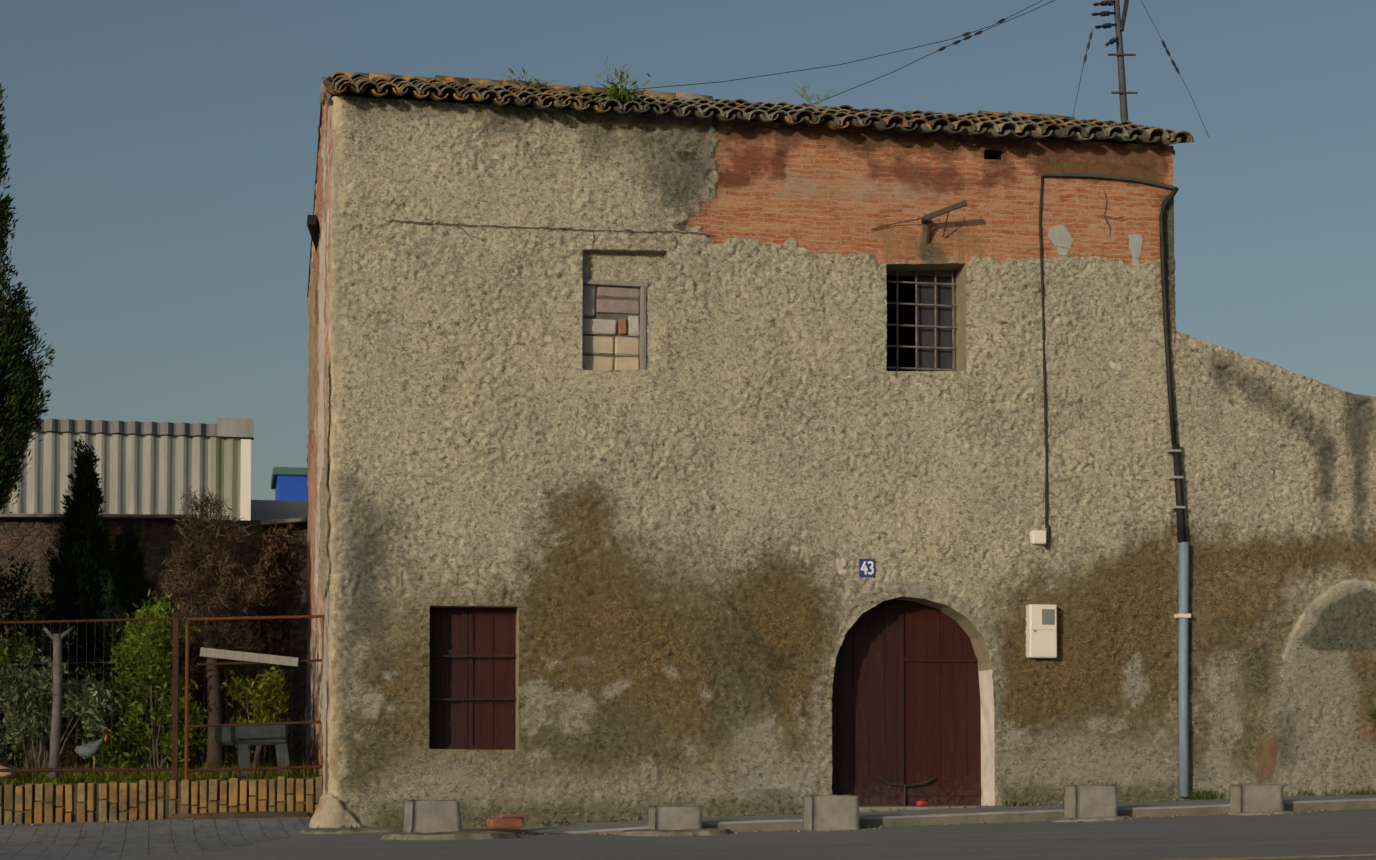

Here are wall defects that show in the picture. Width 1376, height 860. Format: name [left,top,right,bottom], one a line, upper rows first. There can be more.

flaking render [686,121,1174,265]
flaking render [306,100,340,773]
leakage [1214,361,1333,512]
leakage [1348,395,1373,501]
leakage [351,495,823,829]
leakage [1004,523,1376,806]